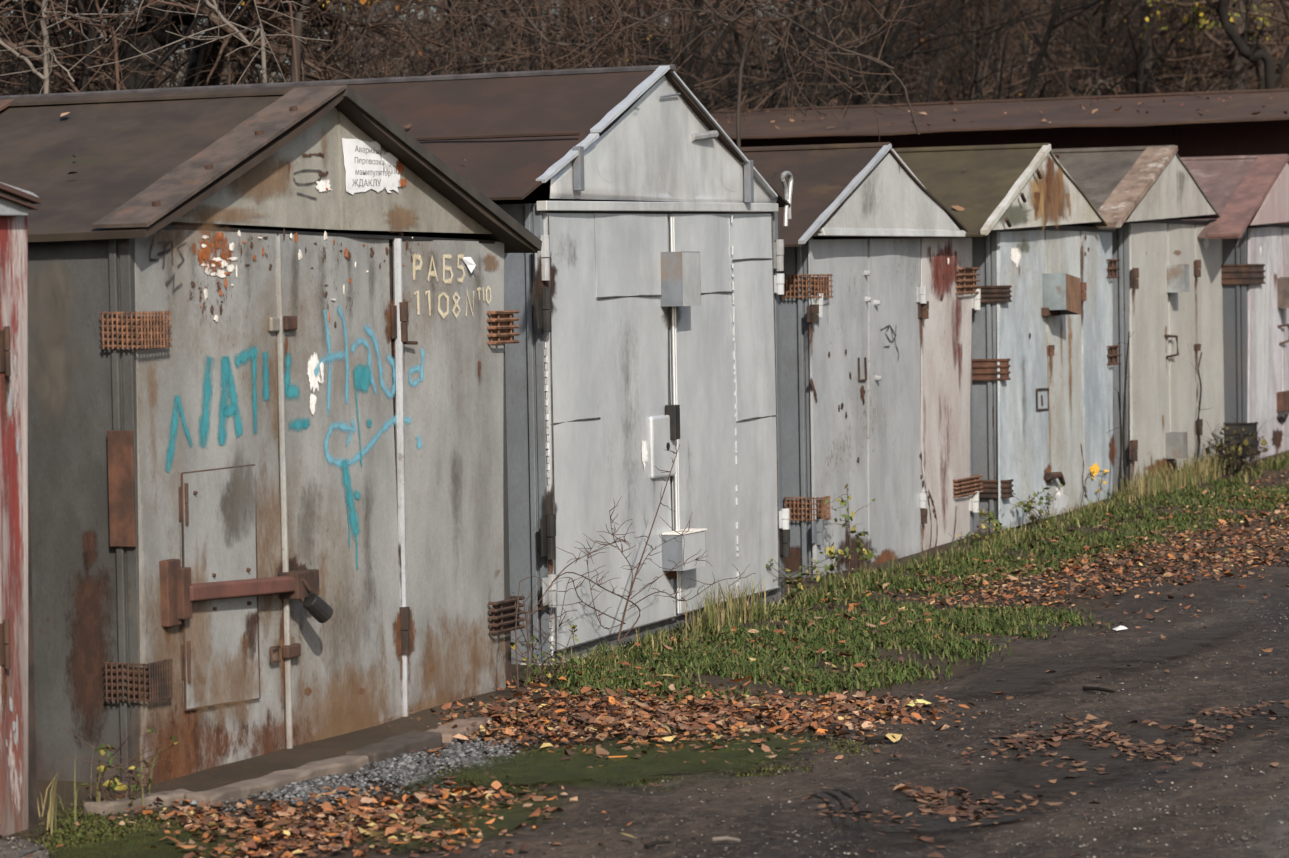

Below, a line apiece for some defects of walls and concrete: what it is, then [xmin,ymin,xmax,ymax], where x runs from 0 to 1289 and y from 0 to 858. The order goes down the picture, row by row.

corrosion [1031,156,1071,226]
peeling [186,229,419,328]
peeling [8,332,20,455]
corrosion [952,296,962,387]
corrosion [224,458,325,596]
peeling [0,666,23,815]
corrosion [132,595,380,785]
corrosion [393,609,498,715]